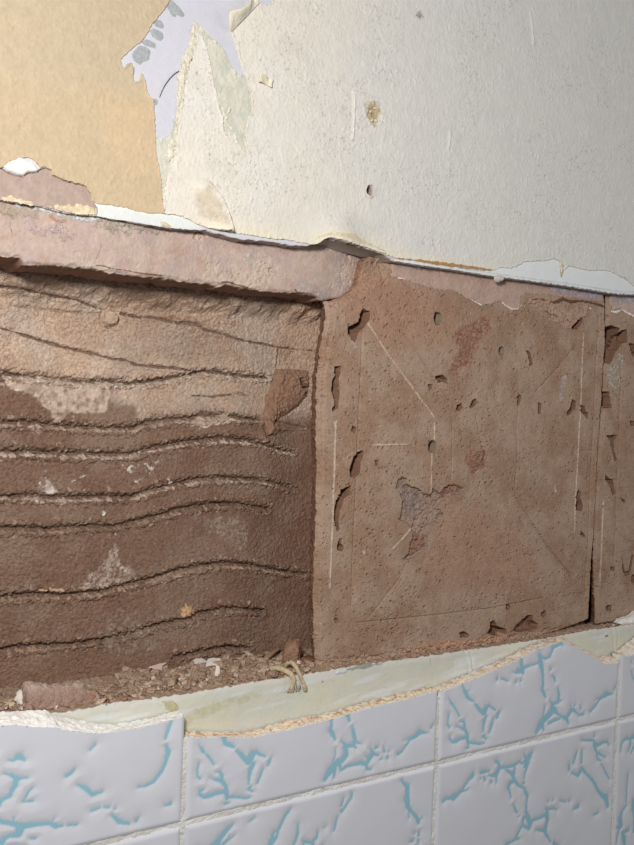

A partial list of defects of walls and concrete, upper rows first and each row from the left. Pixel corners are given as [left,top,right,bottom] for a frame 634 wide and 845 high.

peeling [121,0,272,165]
peeling [394,258,634,295]
spalling [396,477,463,560]
peeling [614,611,634,625]
spalling [0,702,184,734]
spalling [184,636,634,737]